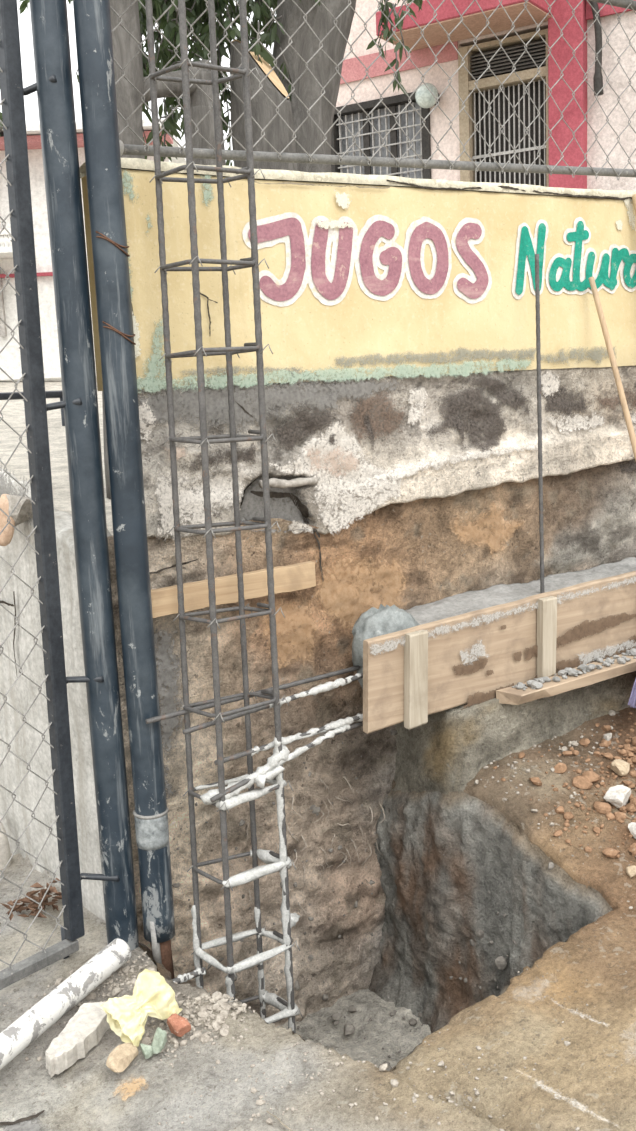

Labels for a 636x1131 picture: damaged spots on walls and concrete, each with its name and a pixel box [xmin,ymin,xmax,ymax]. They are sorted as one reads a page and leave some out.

flaking render [128,254,605,594]
water stain [138,347,615,472]
water stain [542,386,636,416]